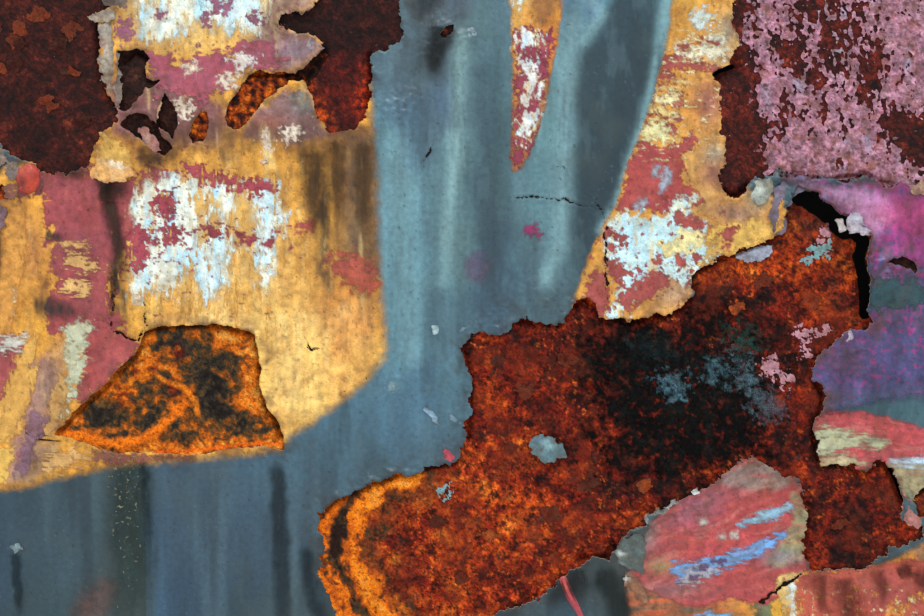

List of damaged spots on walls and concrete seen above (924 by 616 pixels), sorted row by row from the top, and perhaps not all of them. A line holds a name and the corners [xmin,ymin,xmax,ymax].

corrosion [0,0,178,176]
corrosion [714,0,924,198]
peeling [0,0,385,489]
crack [515,195,610,308]
peeling [575,0,924,616]
corrosion [55,324,284,455]
peeling [423,407,440,425]
peeling [529,434,567,464]
corrosion [317,203,924,616]
leakage [12,555,21,606]
leakage [115,463,151,604]
leakage [272,469,289,608]